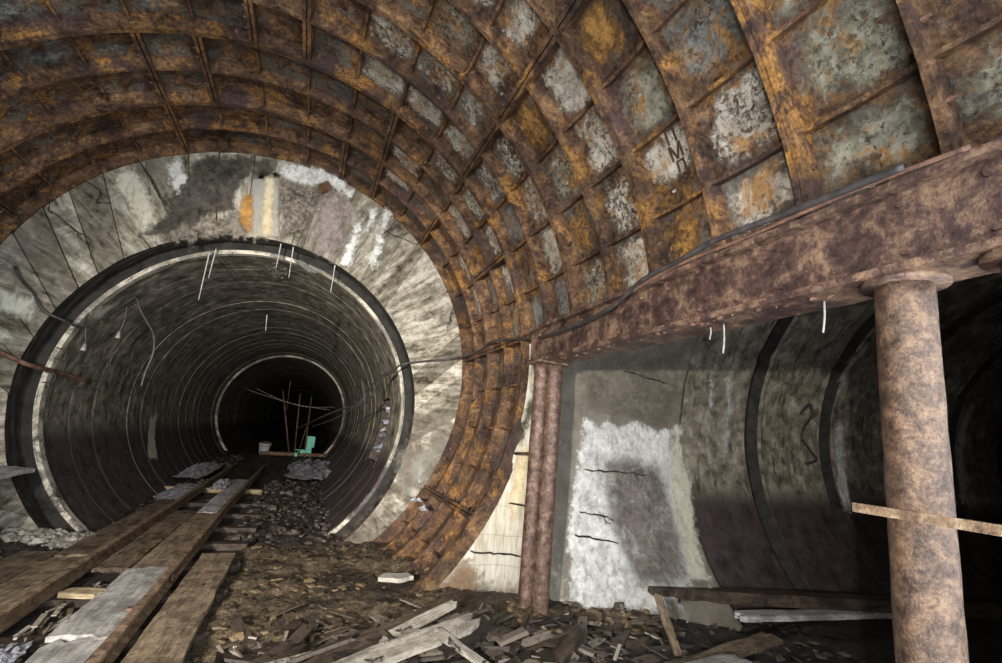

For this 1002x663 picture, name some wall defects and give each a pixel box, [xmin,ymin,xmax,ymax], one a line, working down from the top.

rust [582,4,623,63]
rust [518,99,547,150]
damp [115,154,392,267]
rust [239,177,275,236]
rust [318,180,334,195]
rust [664,214,698,259]
rust [508,449,528,521]
crack [585,468,645,476]
damp [566,354,711,613]
crack [575,511,619,544]
rust [424,559,484,592]